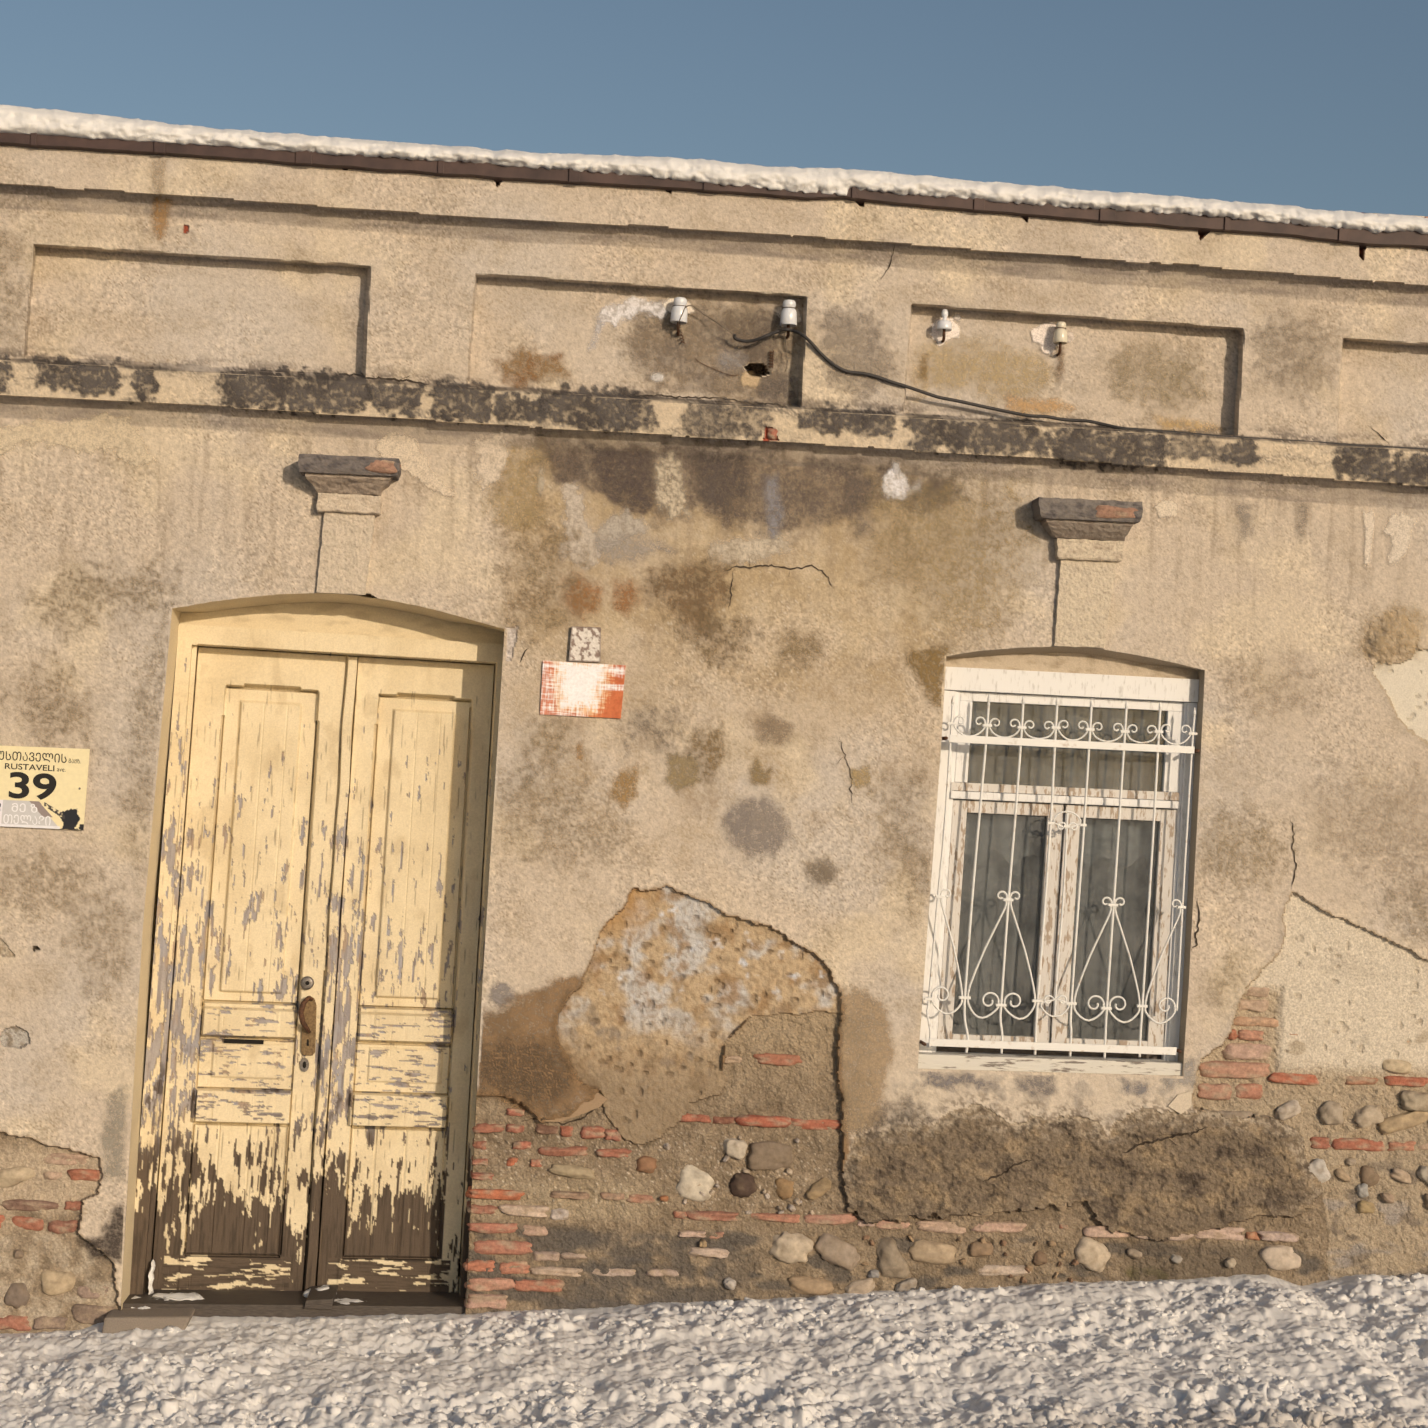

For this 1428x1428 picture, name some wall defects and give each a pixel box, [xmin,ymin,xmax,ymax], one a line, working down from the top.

damp [496,435,1034,627]
damp [645,561,750,666]
crack [723,559,833,607]
spalling [1373,650,1428,741]
damp [613,771,637,806]
damp [626,709,723,791]
damp [751,759,771,784]
spalling [0,938,15,958]
spalling [1,1026,31,1049]
spalling [463,887,1428,1314]
spalling [0,1133,121,1334]